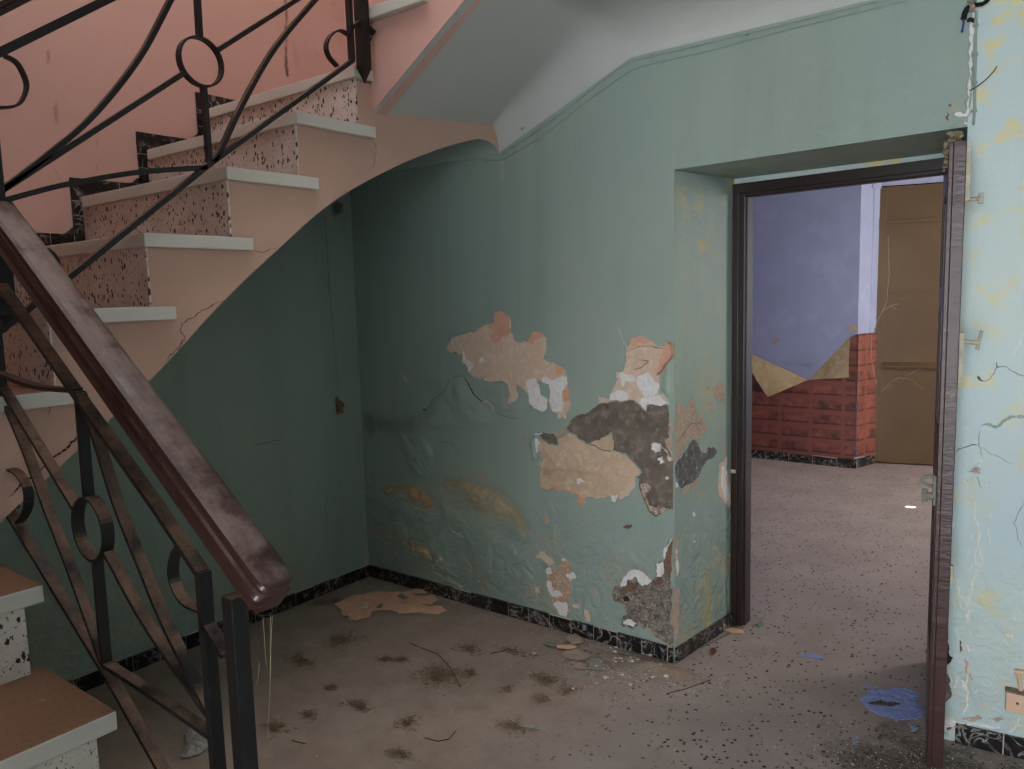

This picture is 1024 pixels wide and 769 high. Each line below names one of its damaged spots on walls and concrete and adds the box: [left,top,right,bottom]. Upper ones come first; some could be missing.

crack [167,301,222,360]
peeling [446,309,731,517]
peeling [534,550,591,622]
spalling [612,534,682,647]
crack [947,415,1024,716]